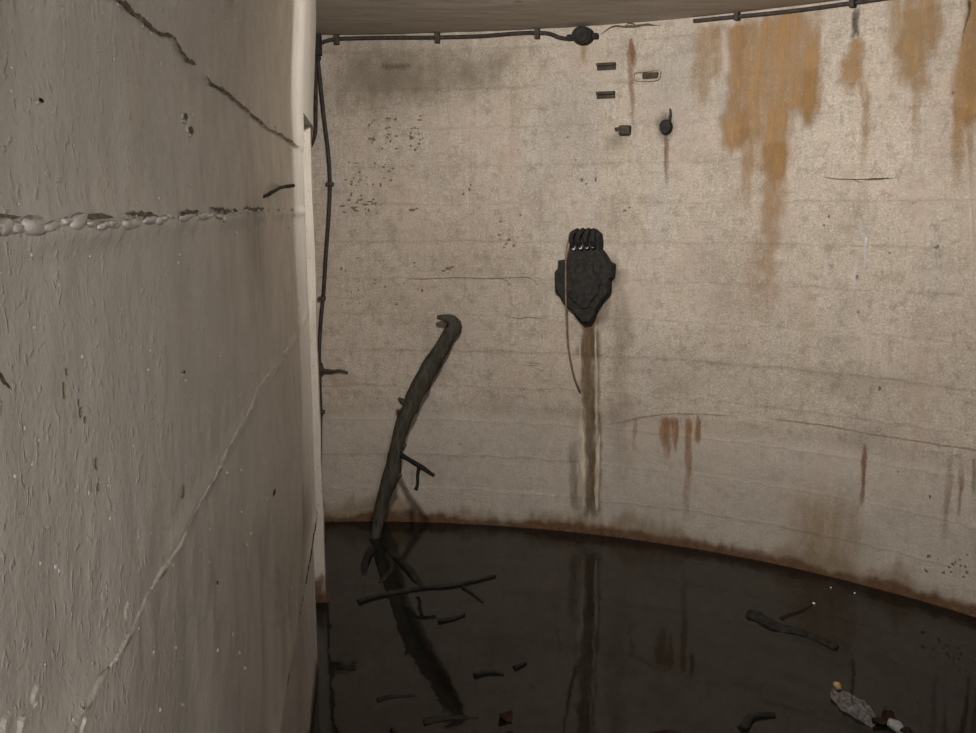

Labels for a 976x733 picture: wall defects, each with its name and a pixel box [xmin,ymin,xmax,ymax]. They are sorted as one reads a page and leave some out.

crack [108,0,299,149]
corrosion [722,13,819,210]
corrosion [843,40,862,84]
corrosion [953,0,976,148]
leakage [324,302,976,617]
corrosion [661,419,700,449]